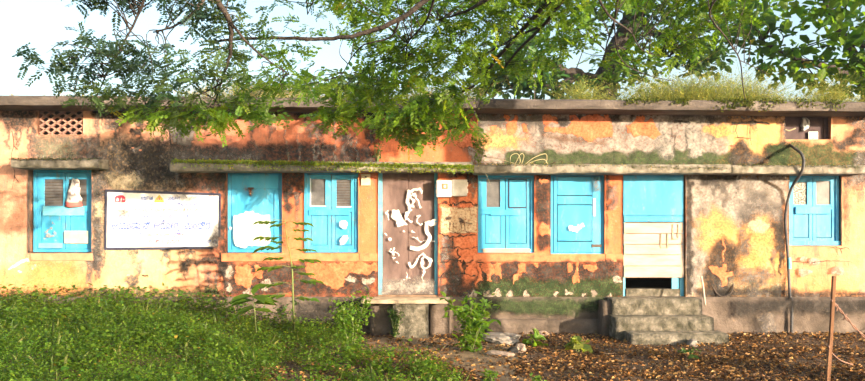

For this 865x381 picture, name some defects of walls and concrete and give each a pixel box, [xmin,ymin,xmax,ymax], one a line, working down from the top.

damp [0,110,391,293]
peeling [180,254,378,297]
peeling [403,183,624,297]
peeling [457,113,789,297]
damp [687,175,865,334]